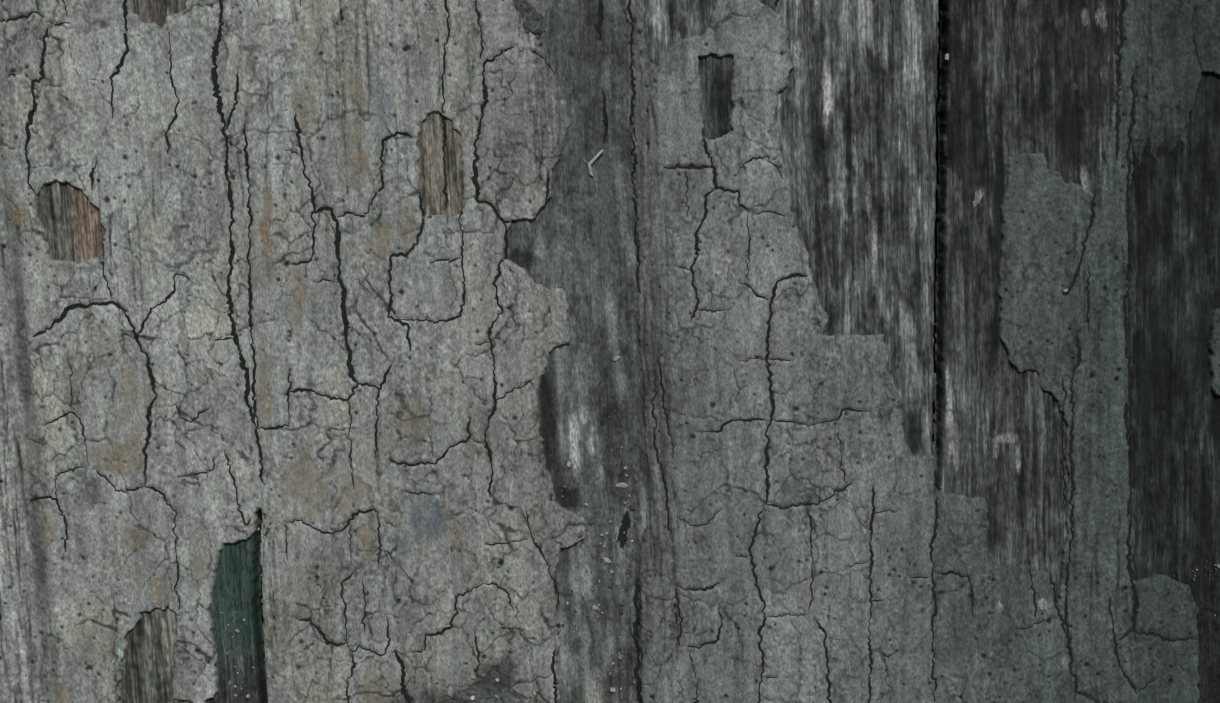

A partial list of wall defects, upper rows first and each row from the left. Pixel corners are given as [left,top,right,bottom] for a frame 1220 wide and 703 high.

crack [0,0,71,196]
peeling [37,181,106,264]
crack [29,0,559,703]
peeling [417,112,464,217]
peeling [504,0,651,703]
peeling [698,55,733,140]
crack [596,0,898,703]
peeling [760,0,1118,603]
peeling [1127,73,1220,703]
peeling [118,608,191,703]
peeling [206,521,268,703]
crack [911,490,974,702]